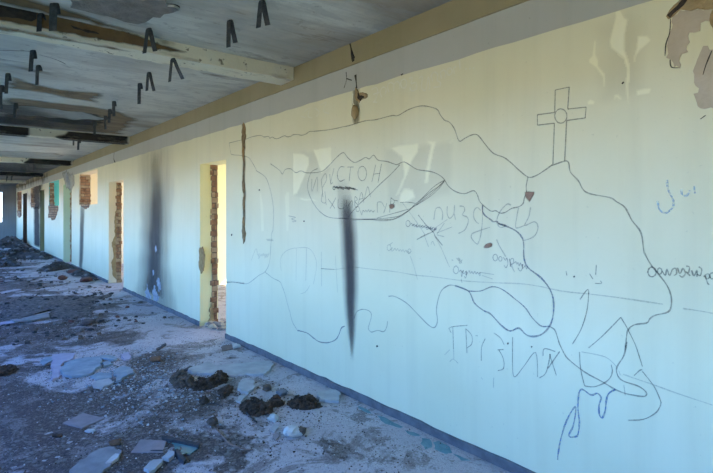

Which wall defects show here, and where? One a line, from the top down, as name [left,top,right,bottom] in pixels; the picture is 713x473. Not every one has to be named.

peeling [665,0,713,68]
peeling [19,106,104,120]
peeling [693,46,713,119]
flaking render [48,183,58,220]
flaking render [63,171,91,262]
flaking render [111,183,122,283]
leakage [148,194,159,294]
flaking render [198,165,219,322]
leakage [345,210,353,336]